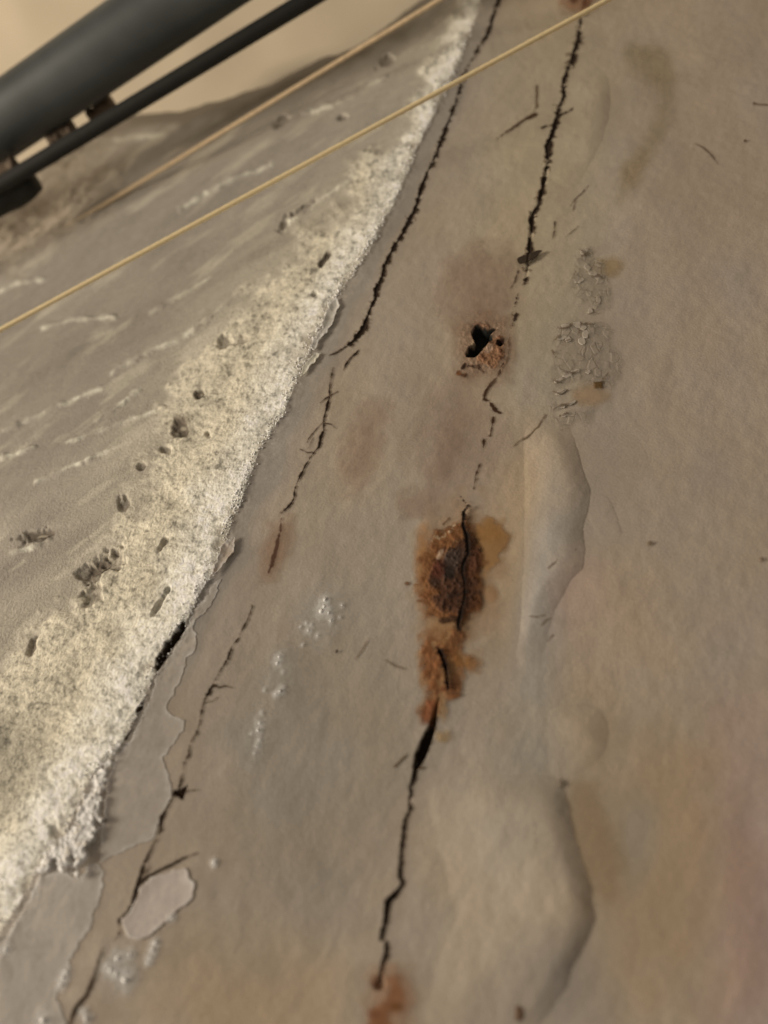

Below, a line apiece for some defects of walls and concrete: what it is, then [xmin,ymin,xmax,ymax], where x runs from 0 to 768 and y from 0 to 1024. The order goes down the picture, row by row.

crack [281,0,501,513]
crack [473,18,585,489]
peeling [550,248,620,426]
peeling [0,537,236,1024]
crack [69,605,253,1024]
crack [378,698,439,980]
rust [405,496,509,741]